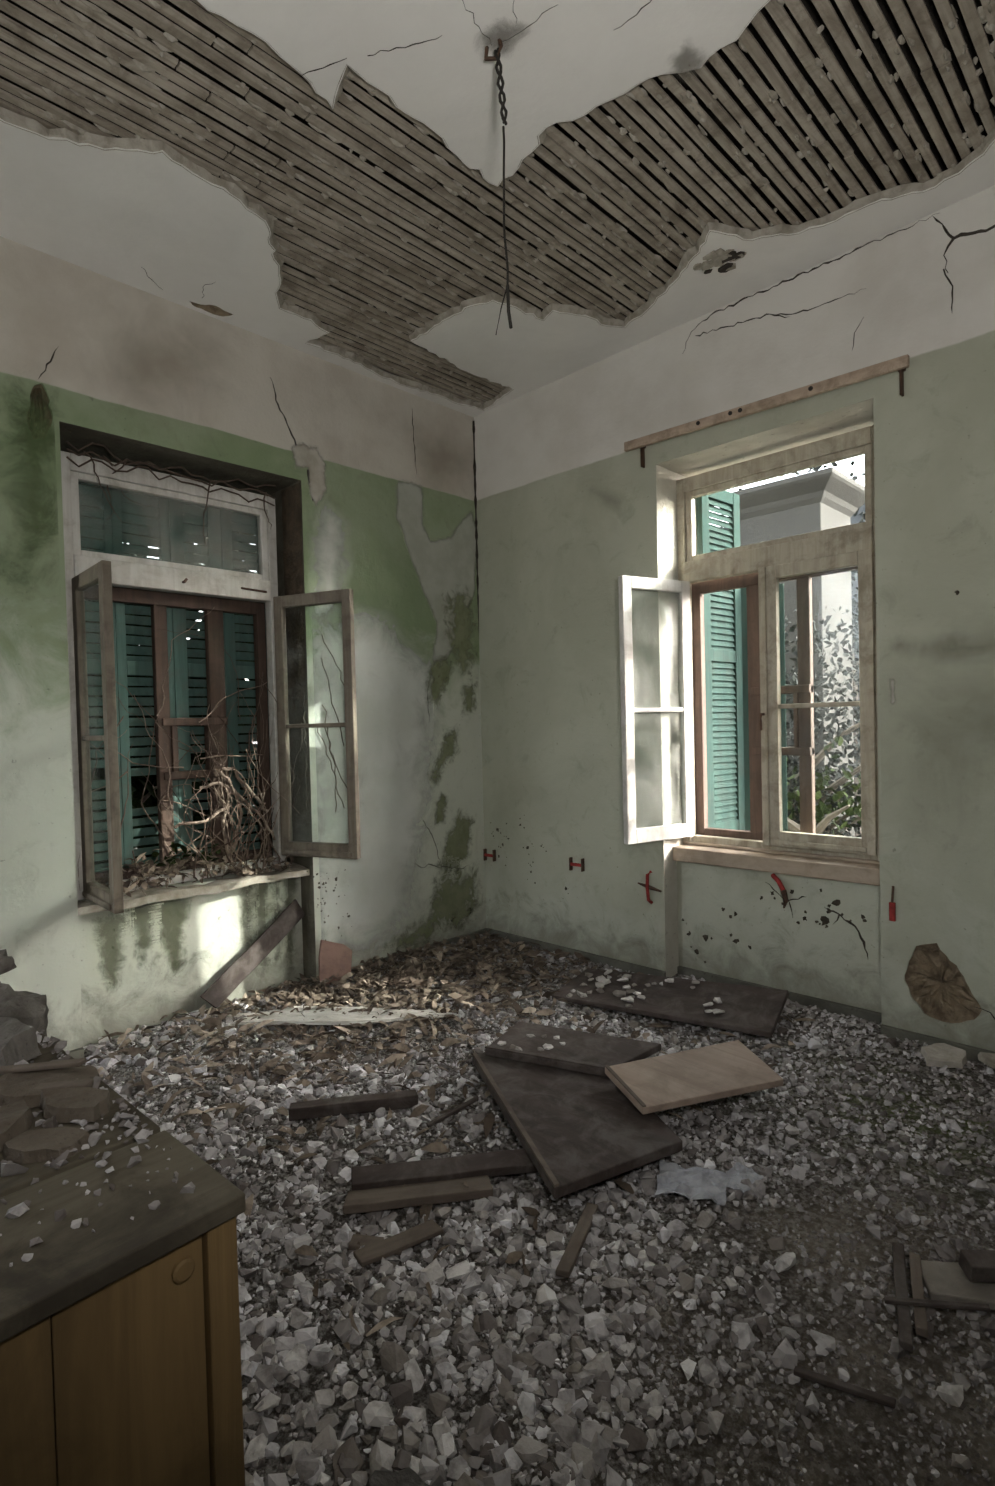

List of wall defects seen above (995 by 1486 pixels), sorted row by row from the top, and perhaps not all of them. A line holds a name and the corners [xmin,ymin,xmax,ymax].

crack [303,36,441,75]
crack [462,0,557,46]
flaking render [0,0,995,411]
crack [682,213,995,354]
crack [270,377,310,476]
peeling [396,482,476,661]
damp [242,593,547,949]
damp [99,899,188,986]
flaking render [905,943,982,1023]